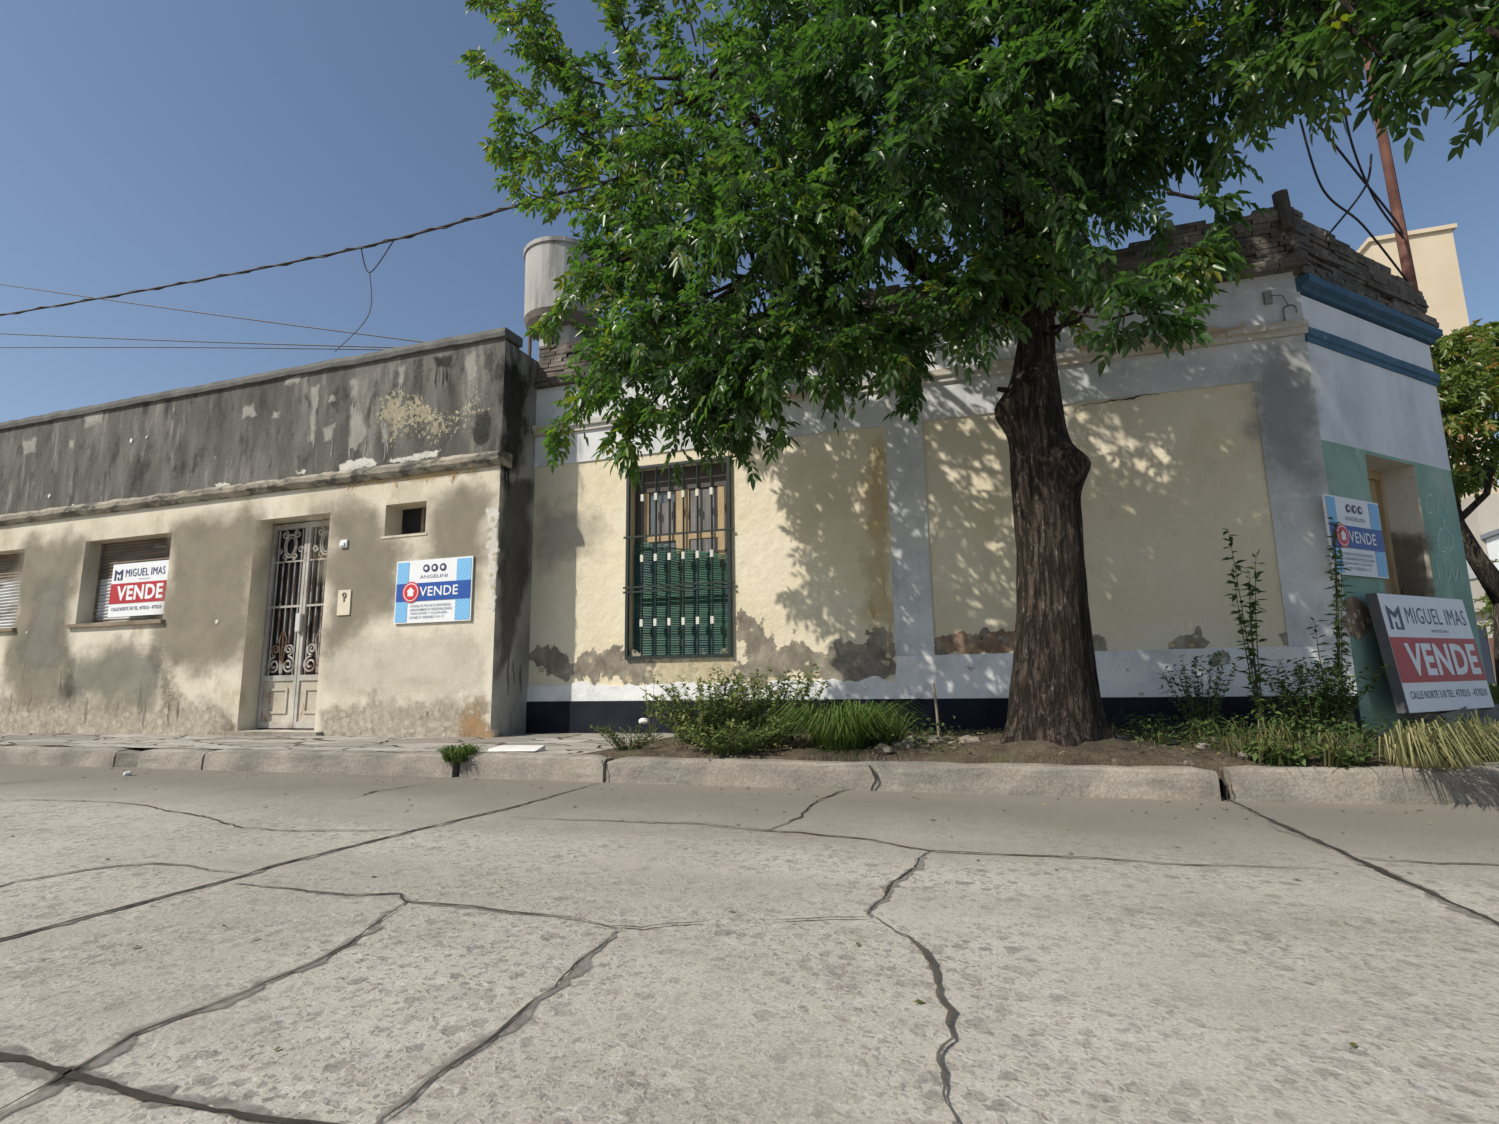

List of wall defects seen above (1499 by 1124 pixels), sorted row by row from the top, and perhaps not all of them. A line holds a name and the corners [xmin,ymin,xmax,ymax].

leakage [0,509,263,728]
leakage [308,379,391,459]
leakage [322,352,533,696]
peeling [529,608,896,687]
peeling [934,628,1015,655]
crack [0,759,1499,1124]